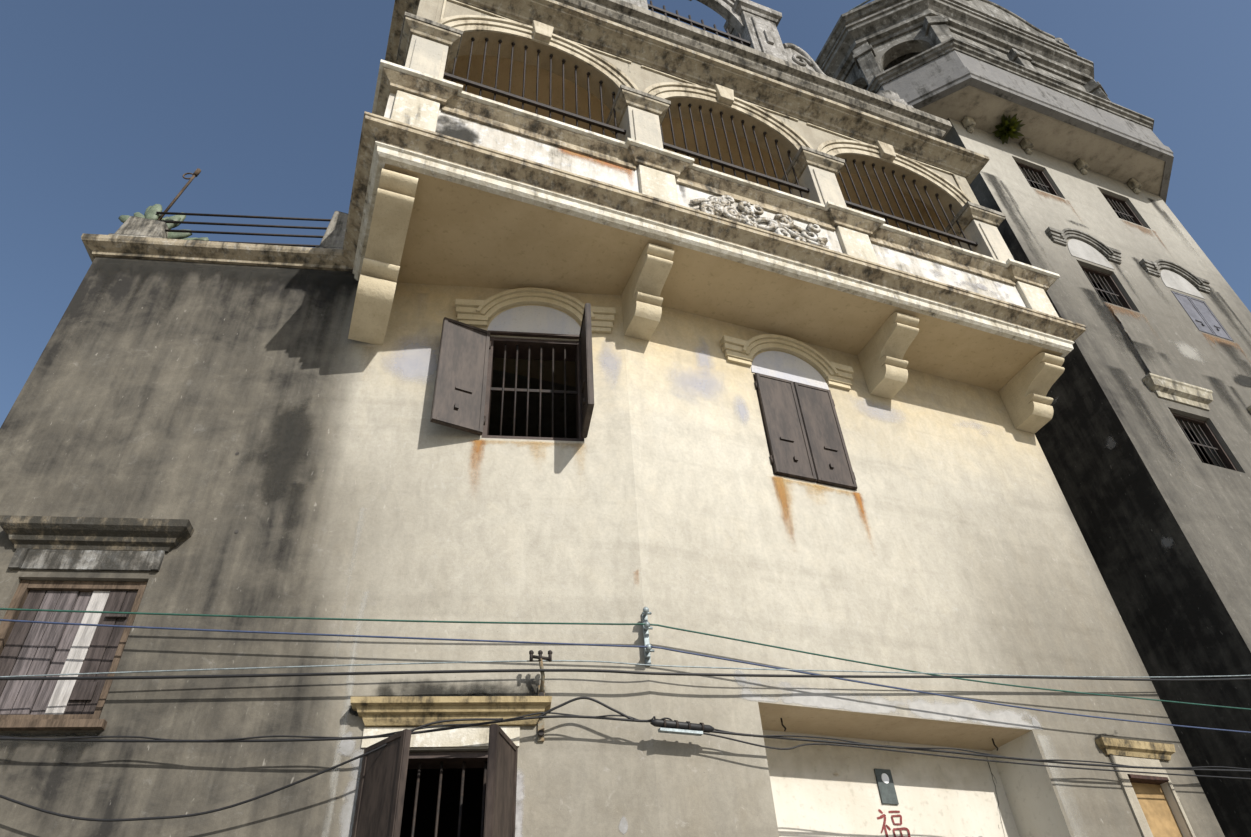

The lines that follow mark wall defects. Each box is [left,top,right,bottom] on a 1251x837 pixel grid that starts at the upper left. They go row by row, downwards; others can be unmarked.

leakage [264,405,310,516]
corrosion [773,477,789,518]
corrosion [847,492,866,523]
leakage [379,683,538,696]